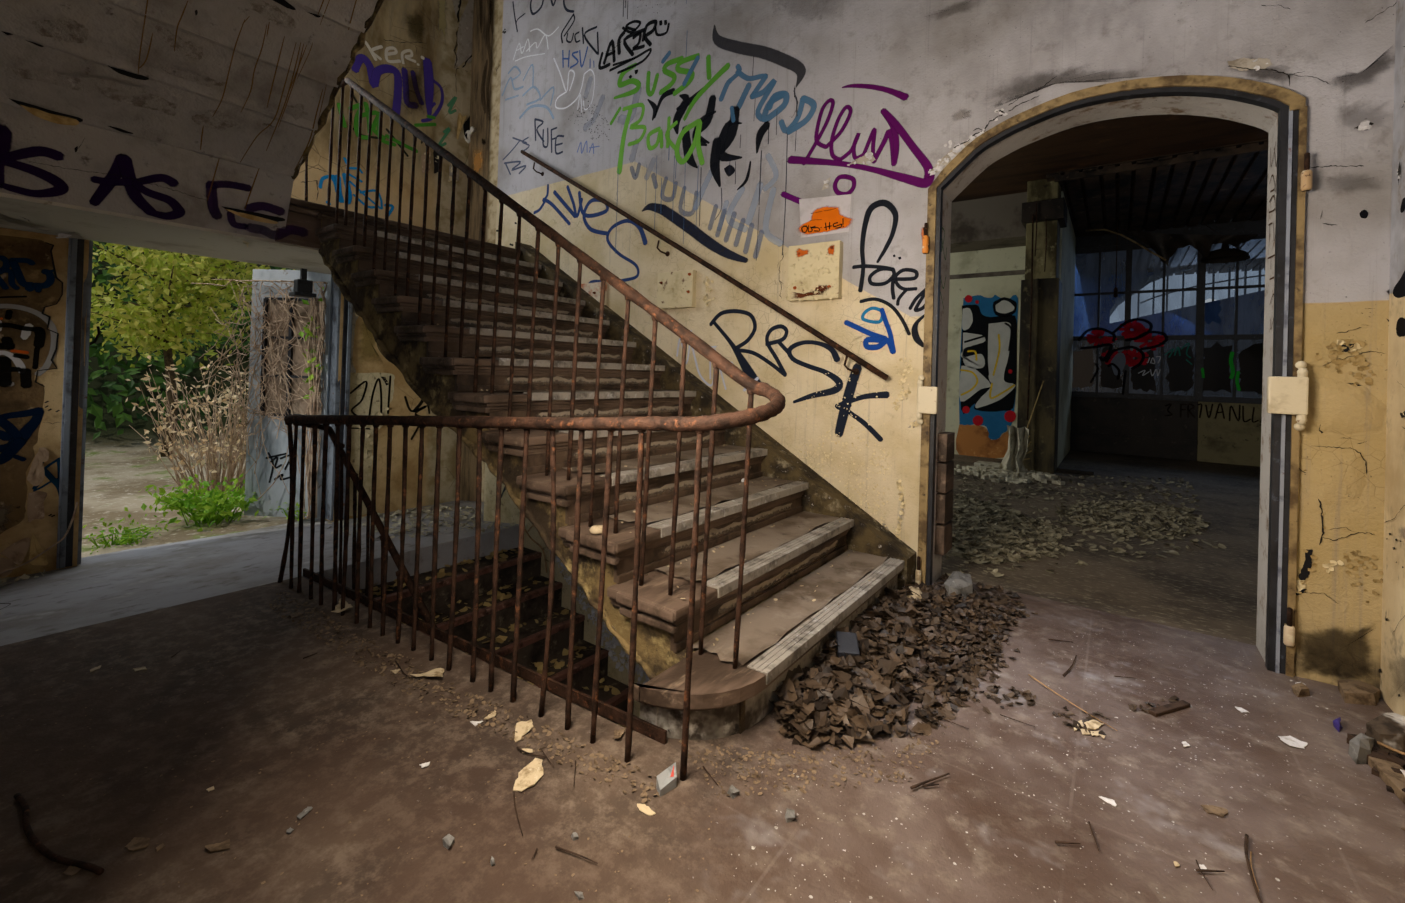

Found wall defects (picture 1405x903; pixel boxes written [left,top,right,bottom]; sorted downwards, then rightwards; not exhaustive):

water stain [406,76,422,108]
peeling [930,131,984,175]
flaking render [0,232,84,534]
crack [1299,425,1405,545]
water stain [1305,629,1369,676]